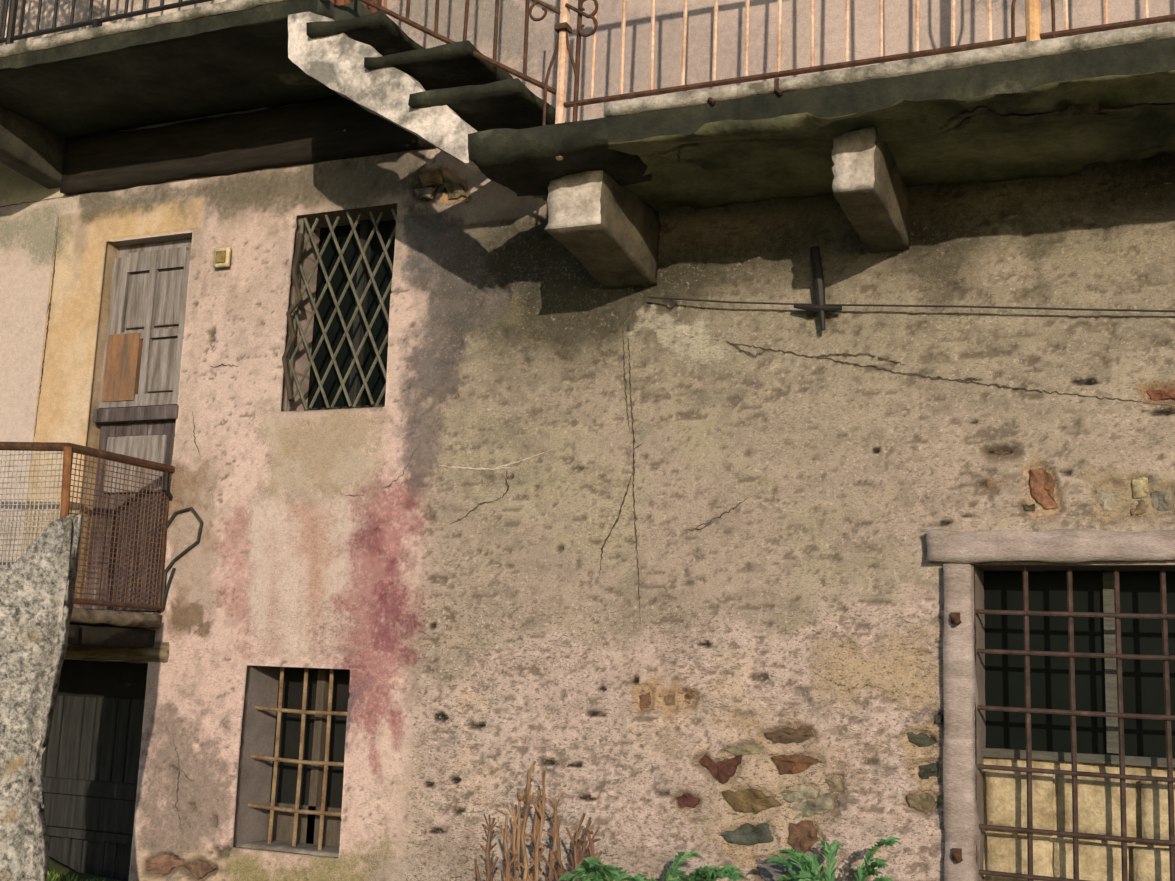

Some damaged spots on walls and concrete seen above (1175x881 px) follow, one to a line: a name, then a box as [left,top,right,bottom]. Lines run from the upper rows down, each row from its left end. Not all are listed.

water stain [1064,153,1175,215]
water stain [887,194,1021,267]
water stain [404,206,867,491]
crack [693,336,1175,407]
crack [451,471,510,524]
crack [599,299,641,621]
spalling [1022,457,1063,519]
spalling [1084,467,1175,521]
peeling [139,704,229,880]
spalling [676,718,844,881]